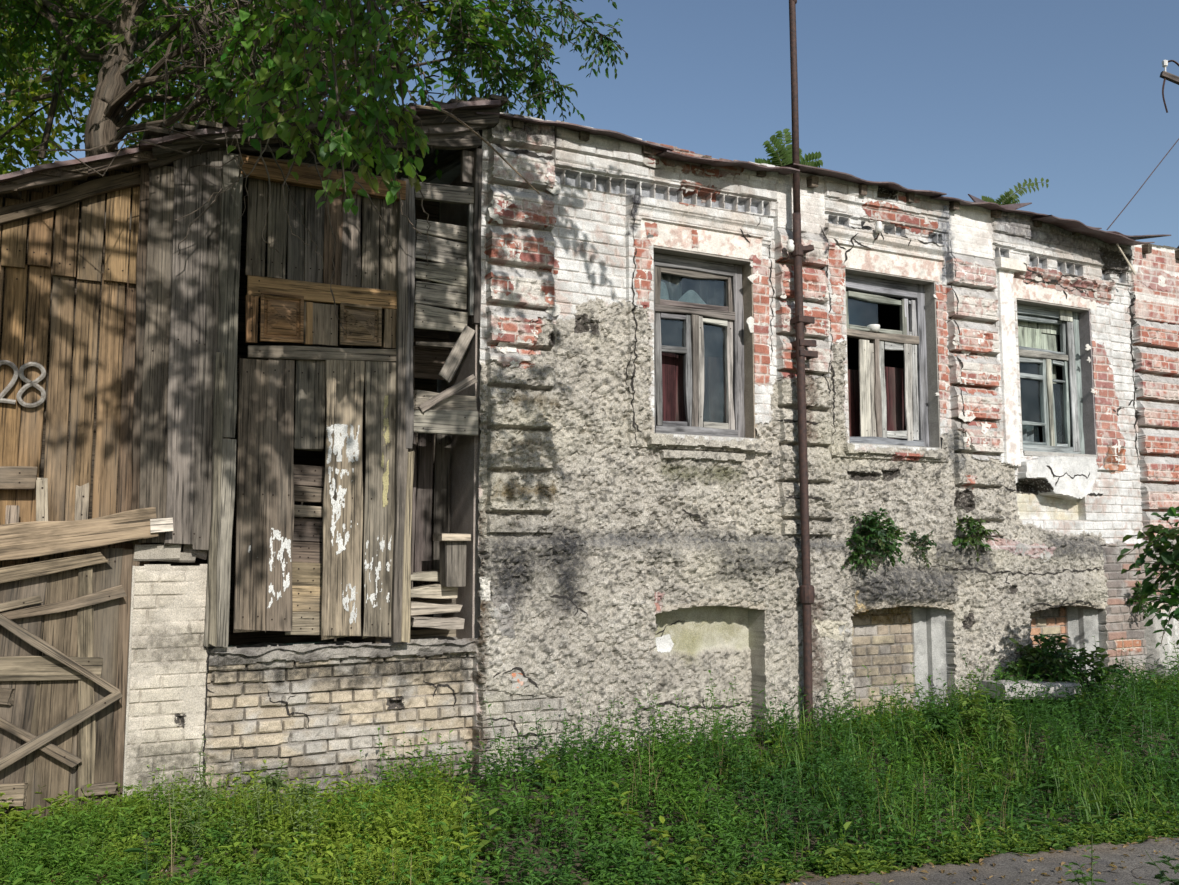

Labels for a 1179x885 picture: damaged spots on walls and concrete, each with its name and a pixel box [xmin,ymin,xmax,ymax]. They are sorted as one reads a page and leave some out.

peeling [484,198,561,369]
crack [625,197,642,445]
peeling [746,242,846,386]
crack [777,224,967,471]
peeling [933,258,1001,448]
peeling [1085,340,1126,474]
peeling [1137,266,1179,292]
peeling [326,424,360,555]
crack [1047,465,1103,496]
peeling [341,535,392,624]
crack [494,667,538,688]